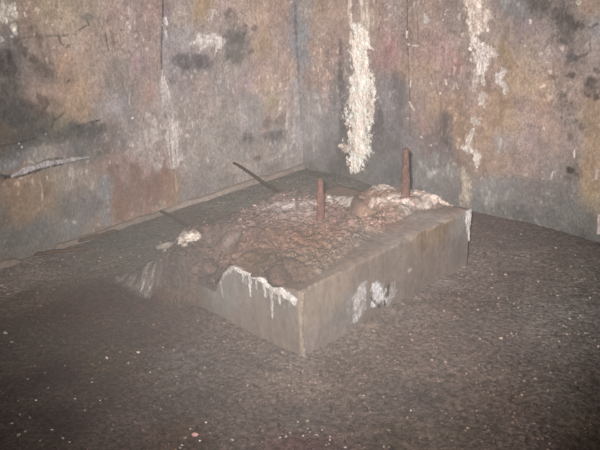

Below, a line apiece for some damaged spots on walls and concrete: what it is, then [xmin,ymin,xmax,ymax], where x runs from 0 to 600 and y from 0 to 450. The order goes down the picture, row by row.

water stain [338,0,383,174]
water stain [462,0,498,109]
water stain [494,67,508,95]
crack [0,156,89,179]
rust [233,162,281,193]
water stain [461,116,481,169]
water stain [218,266,306,357]
water stain [345,281,397,323]